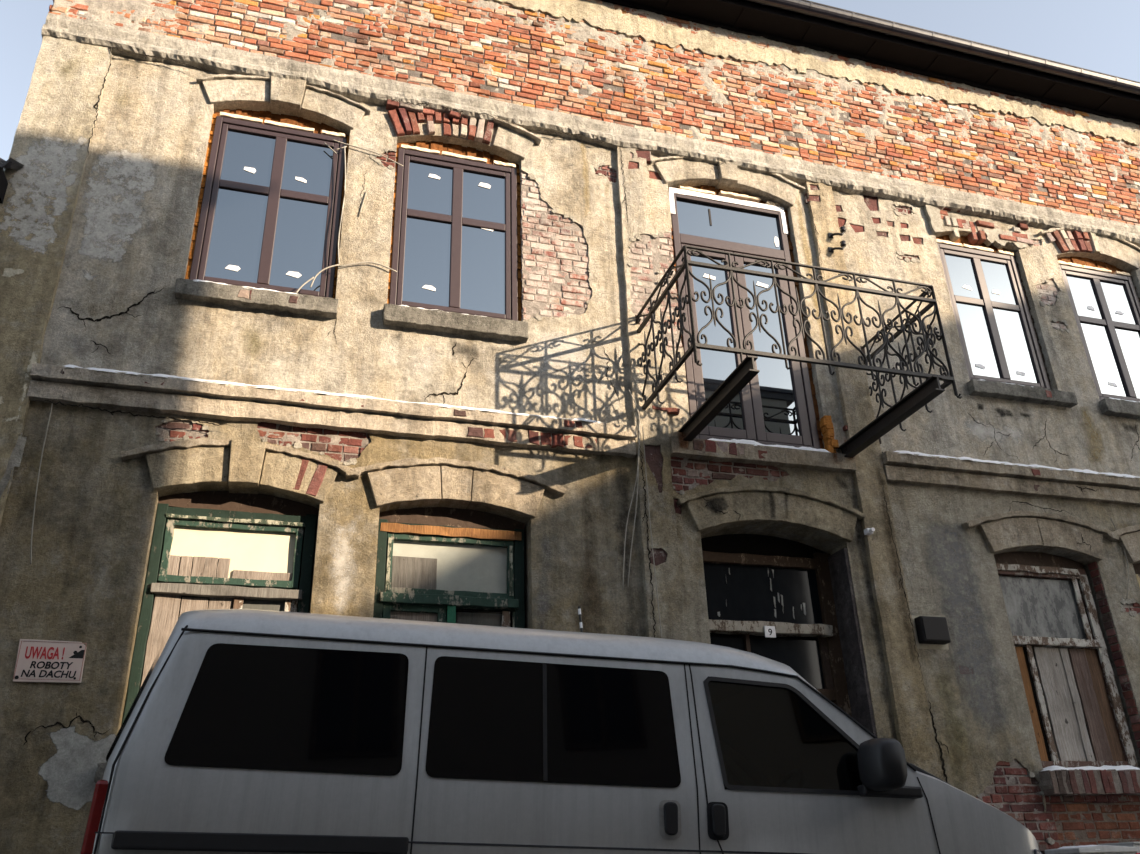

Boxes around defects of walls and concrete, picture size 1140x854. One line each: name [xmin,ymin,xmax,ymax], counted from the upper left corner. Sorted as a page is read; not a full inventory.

crack [85,47,210,164]
flaking render [370,148,396,169]
flaking render [386,99,494,145]
peeling [0,136,155,262]
flaking render [520,171,592,321]
crack [59,288,162,354]
flaking render [624,229,682,355]
crack [425,342,475,404]
flaking render [155,419,210,442]
flaking render [257,422,371,497]
crack [23,713,110,746]
flaking render [976,759,1140,850]